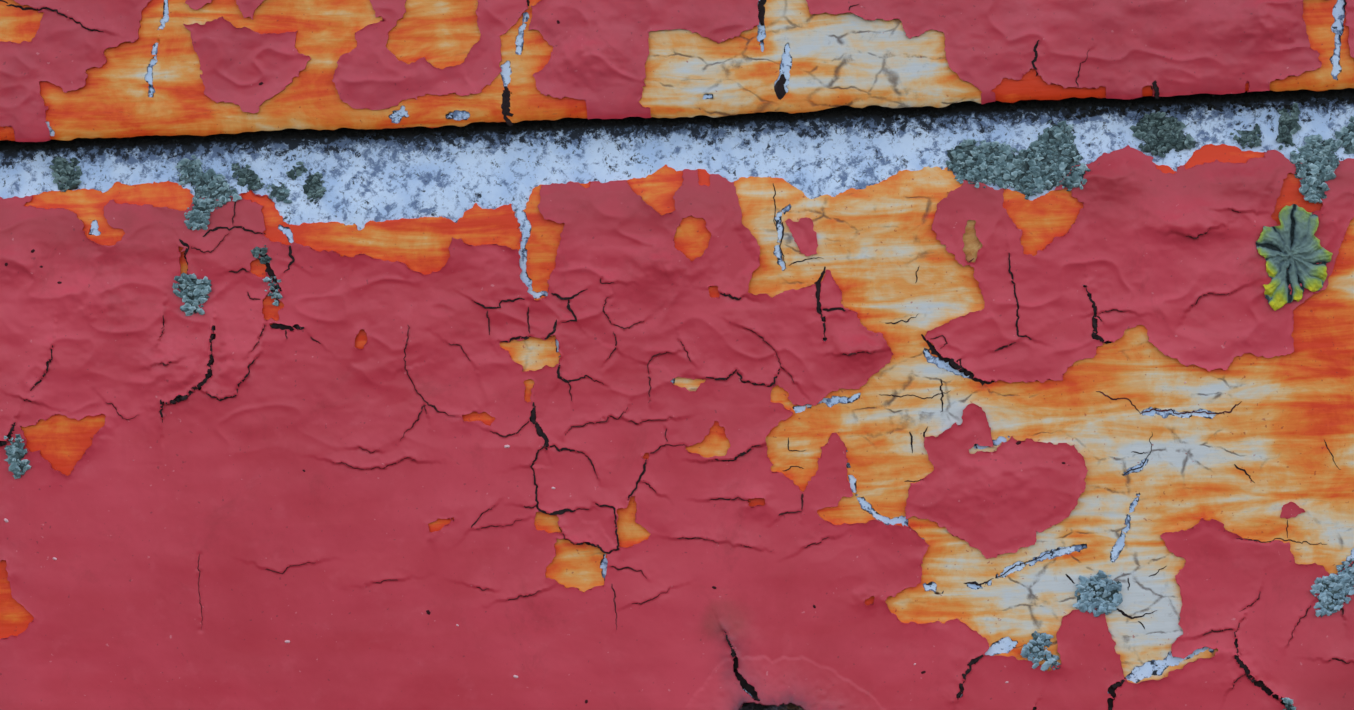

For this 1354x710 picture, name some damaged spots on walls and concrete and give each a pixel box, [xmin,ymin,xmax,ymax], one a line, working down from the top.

peeling [40,0,587,141]
peeling [639,0,1106,118]
peeling [1270,0,1354,92]
peeling [24,181,194,246]
peeling [1155,144,1269,174]
crack [107,202,321,423]
crack [773,184,1032,482]
crack [1083,285,1123,344]
crack [450,279,805,630]
peeling [734,166,1354,683]
crack [724,631,759,701]
crack [1203,593,1292,710]